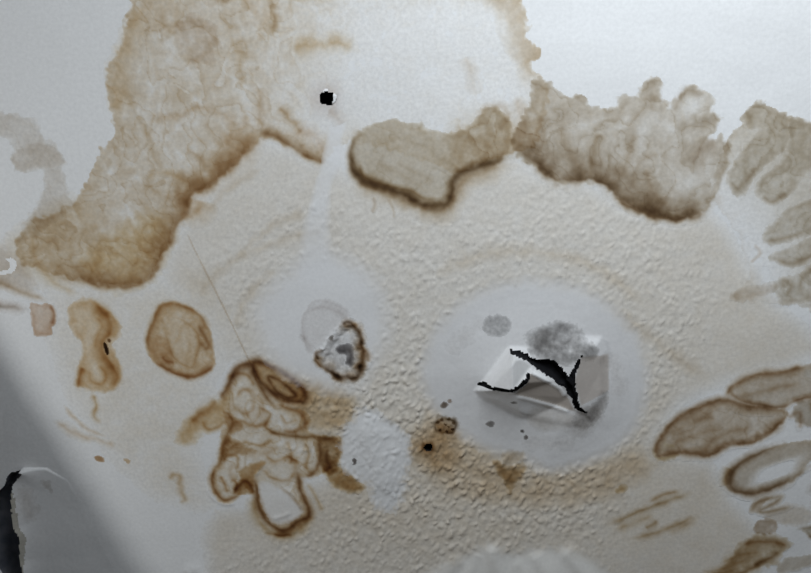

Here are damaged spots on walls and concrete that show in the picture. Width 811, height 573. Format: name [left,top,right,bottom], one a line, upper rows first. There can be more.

leakage [0,0,543,297]
leakage [487,75,727,227]
spalling [311,316,374,388]
leakage [0,122,811,573]
crack [477,349,587,413]